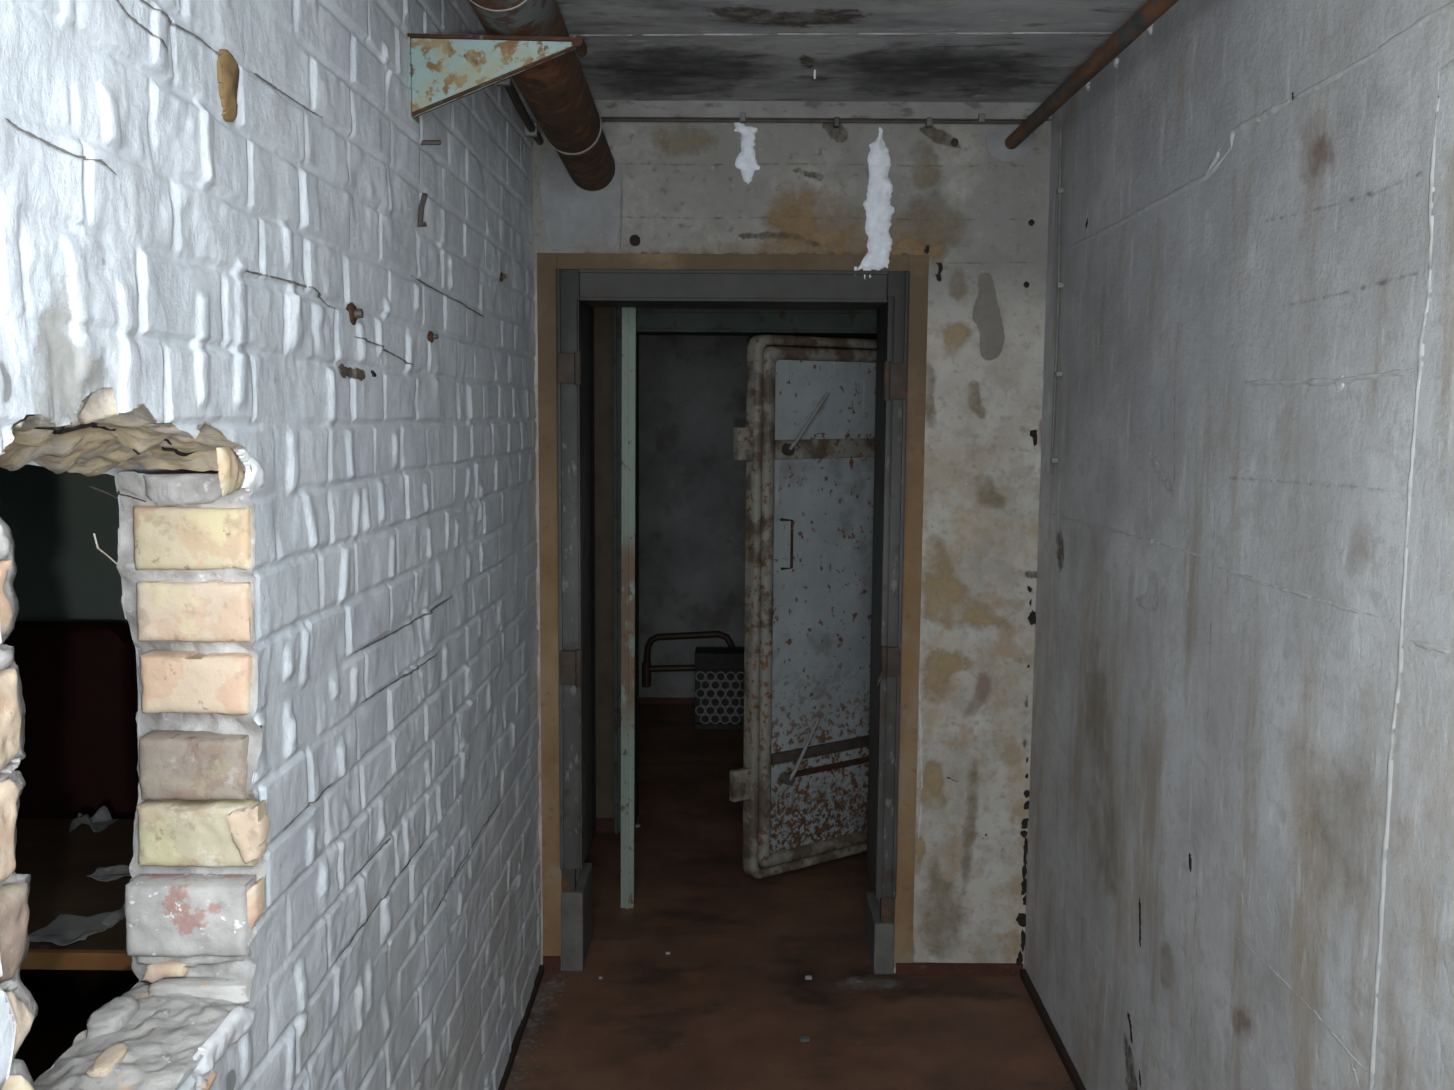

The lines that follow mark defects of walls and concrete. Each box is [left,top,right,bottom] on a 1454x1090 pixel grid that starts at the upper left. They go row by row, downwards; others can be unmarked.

damp [605,48,755,95]
damp [850,50,1028,96]
crack [5,118,117,175]
damp [734,122,760,184]
damp [854,127,906,279]
damp [944,273,1004,360]
spalling [0,297,269,1090]